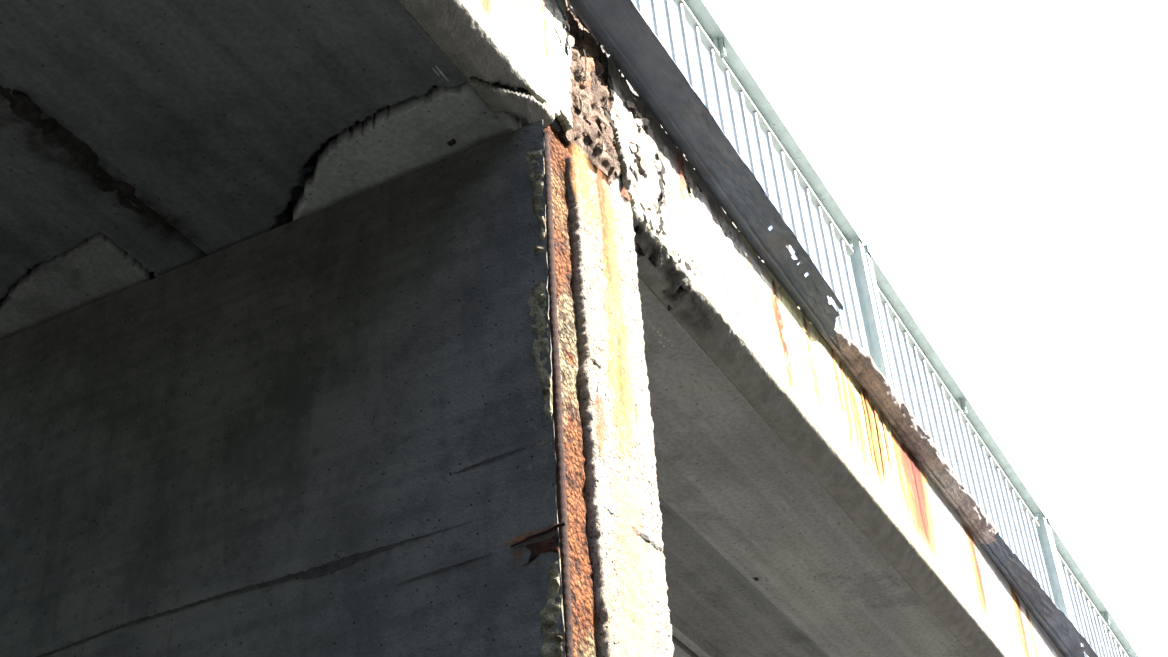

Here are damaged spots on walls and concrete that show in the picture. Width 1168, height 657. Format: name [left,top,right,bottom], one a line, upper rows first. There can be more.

spalling [634,112,650,126]
spalling [509,0,643,657]
corrosion [574,146,632,439]
corrosion [748,257,794,390]
corrosion [804,317,938,556]
corrosion [964,526,988,622]
corrosion [1011,587,1039,657]